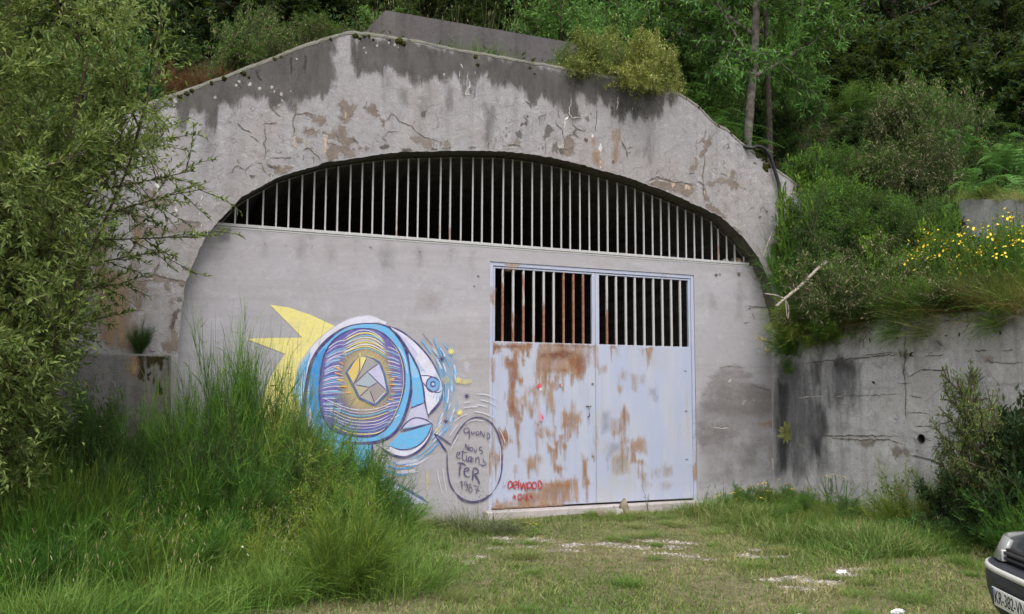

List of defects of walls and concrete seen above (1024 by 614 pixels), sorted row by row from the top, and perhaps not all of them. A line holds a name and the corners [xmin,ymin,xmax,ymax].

water stain [152,39,336,129]
water stain [351,36,677,128]
crack [230,103,320,173]
spalling [293,99,389,161]
corrosion [489,342,595,509]
corrosion [613,407,646,463]
water stain [726,363,826,473]
water stain [834,357,855,400]
crack [798,318,1020,464]